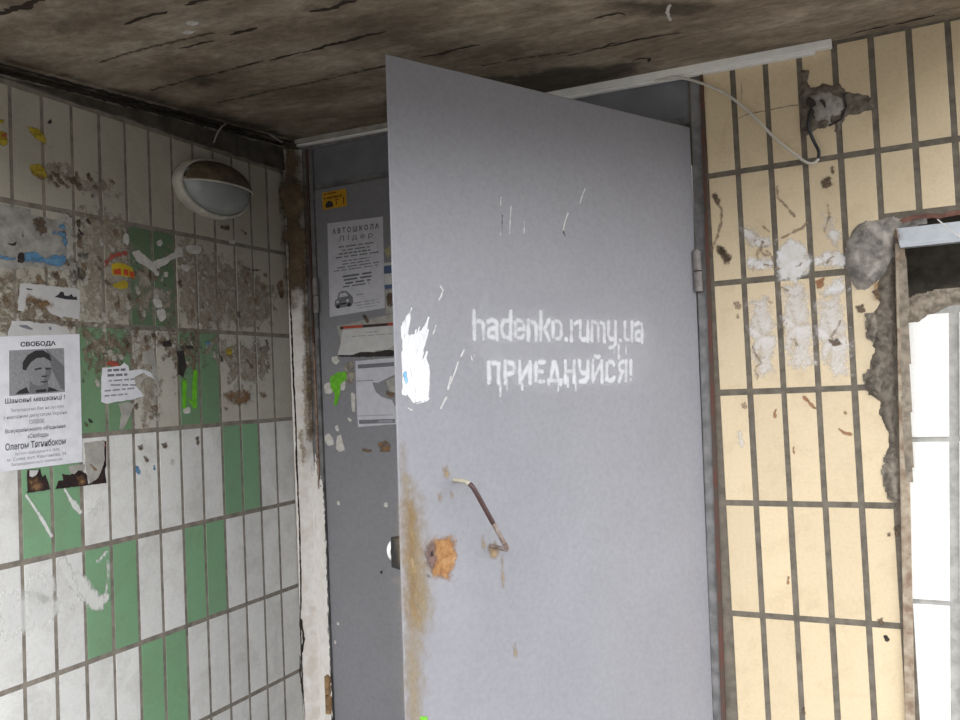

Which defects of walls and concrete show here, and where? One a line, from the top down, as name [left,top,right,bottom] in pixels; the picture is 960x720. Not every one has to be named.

crack [0,0,45,15]
crack [124,0,209,25]
damp [618,3,709,15]
crack [0,27,386,143]
crack [421,33,678,66]
damp [490,63,635,93]
spalling [799,70,874,136]
peeling [28,212,129,286]
peeling [86,245,202,333]
peeling [83,328,162,370]
spalling [863,257,914,547]
rust [406,502,457,628]